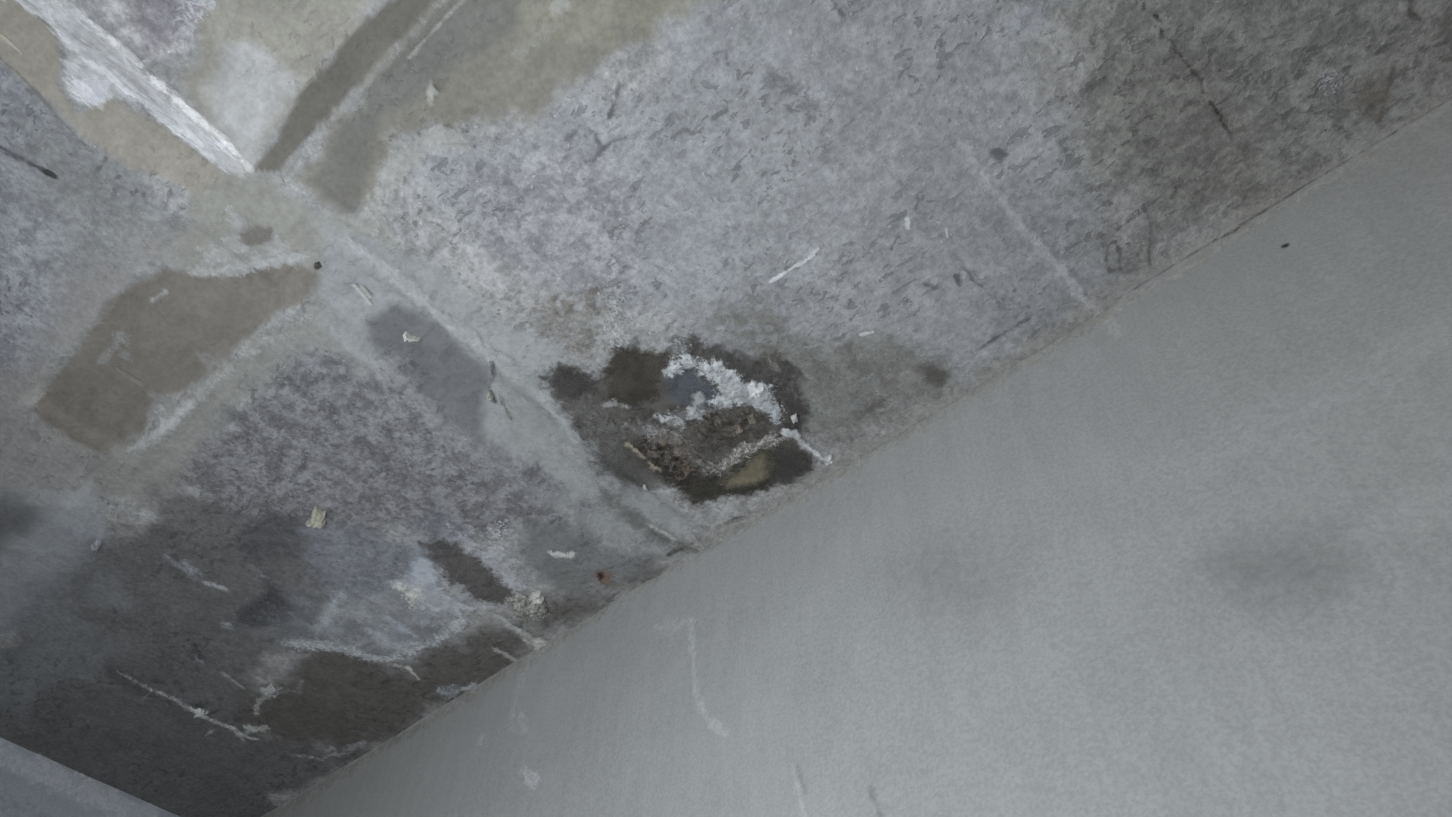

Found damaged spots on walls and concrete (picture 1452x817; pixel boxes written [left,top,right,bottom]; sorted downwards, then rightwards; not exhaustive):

crack [0,57,93,153]
crack [0,146,57,179]
spalling [638,400,771,481]
water stain [531,288,947,556]
water stain [164,554,228,590]
water stain [223,520,546,680]